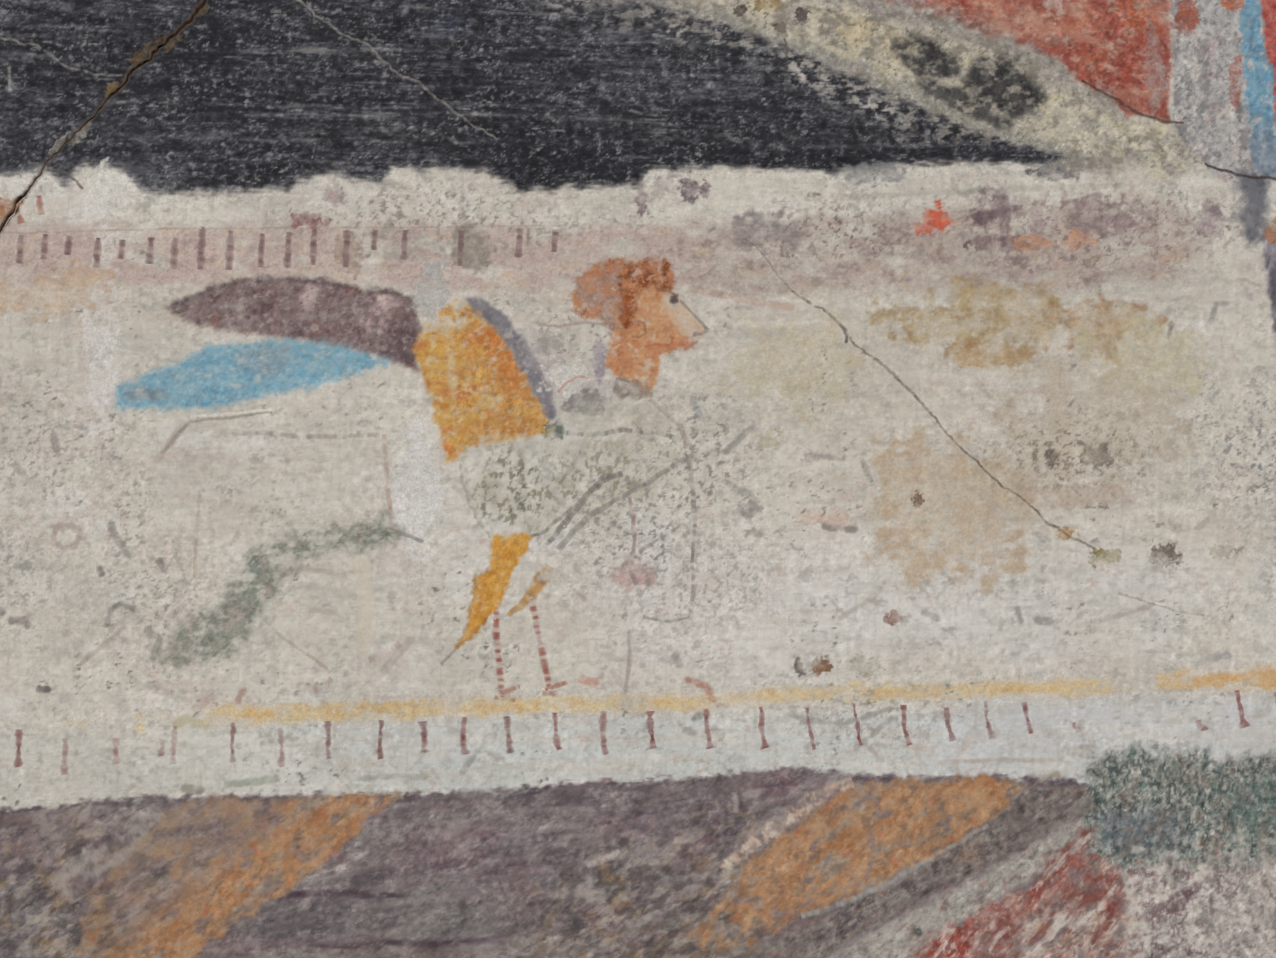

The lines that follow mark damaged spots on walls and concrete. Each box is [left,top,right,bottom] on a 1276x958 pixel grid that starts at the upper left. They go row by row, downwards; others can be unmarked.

crack [0,0,212,240]
crack [292,0,498,141]
crack [1081,79,1184,124]
crack [1204,162,1276,181]
crack [742,236,1095,550]
crack [1118,591,1205,616]